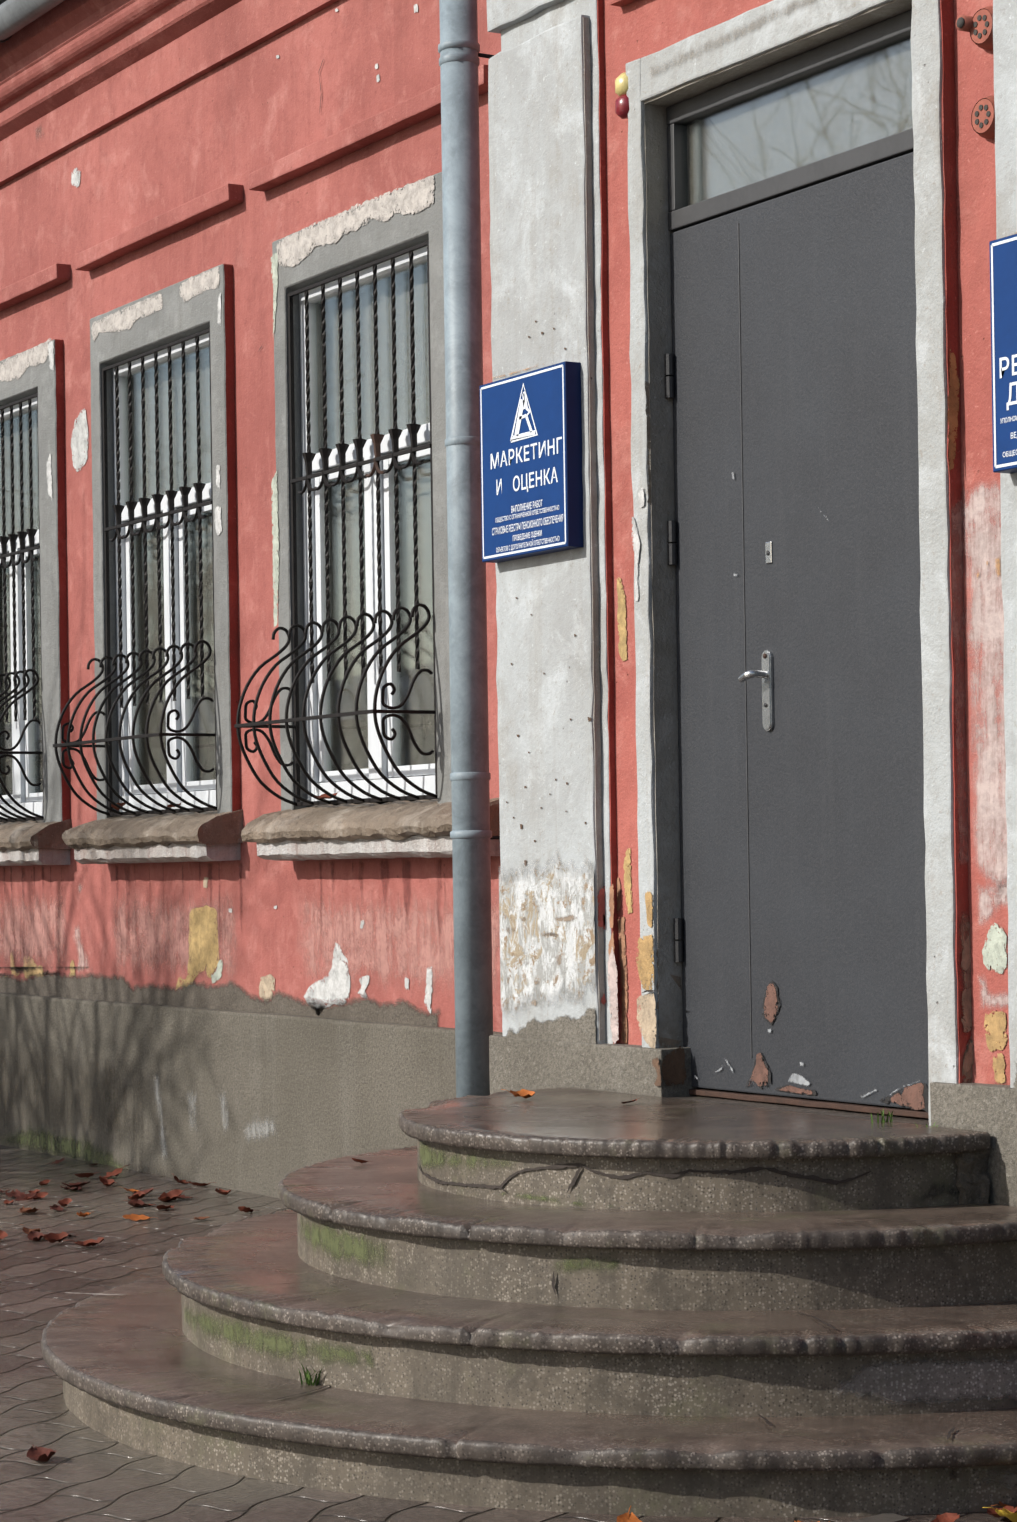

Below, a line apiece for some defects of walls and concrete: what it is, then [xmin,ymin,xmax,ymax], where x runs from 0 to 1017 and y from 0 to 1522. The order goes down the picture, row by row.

peeling [0,338,54,382]
peeling [91,267,221,341]
peeling [271,175,434,337]
peeling [214,465,222,536]
peeling [271,471,279,628]
peeling [617,381,651,661]
flaking render [0,877,439,1027]
peeling [499,848,686,1086]
flaking render [961,916,1017,1089]
crack [417,1163,871,1194]